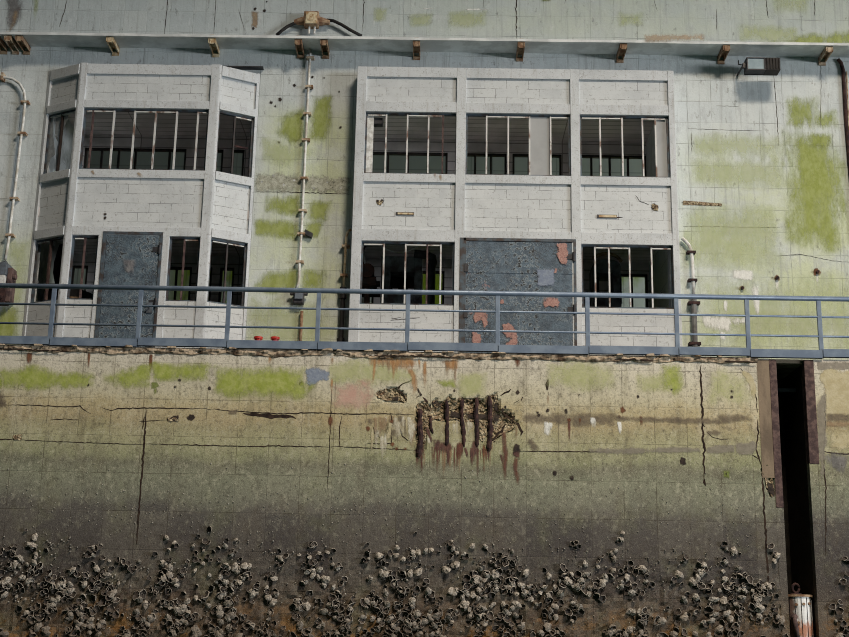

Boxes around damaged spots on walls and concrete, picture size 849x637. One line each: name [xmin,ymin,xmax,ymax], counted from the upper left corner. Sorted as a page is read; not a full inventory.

peeling [537,243,568,286]
peeling [543,297,560,308]
rust [371,357,426,388]
crack [0,404,414,543]
spalling [375,380,523,457]
rust [417,428,493,468]
rust [500,433,520,481]
crack [510,412,597,452]
crack [698,366,706,486]